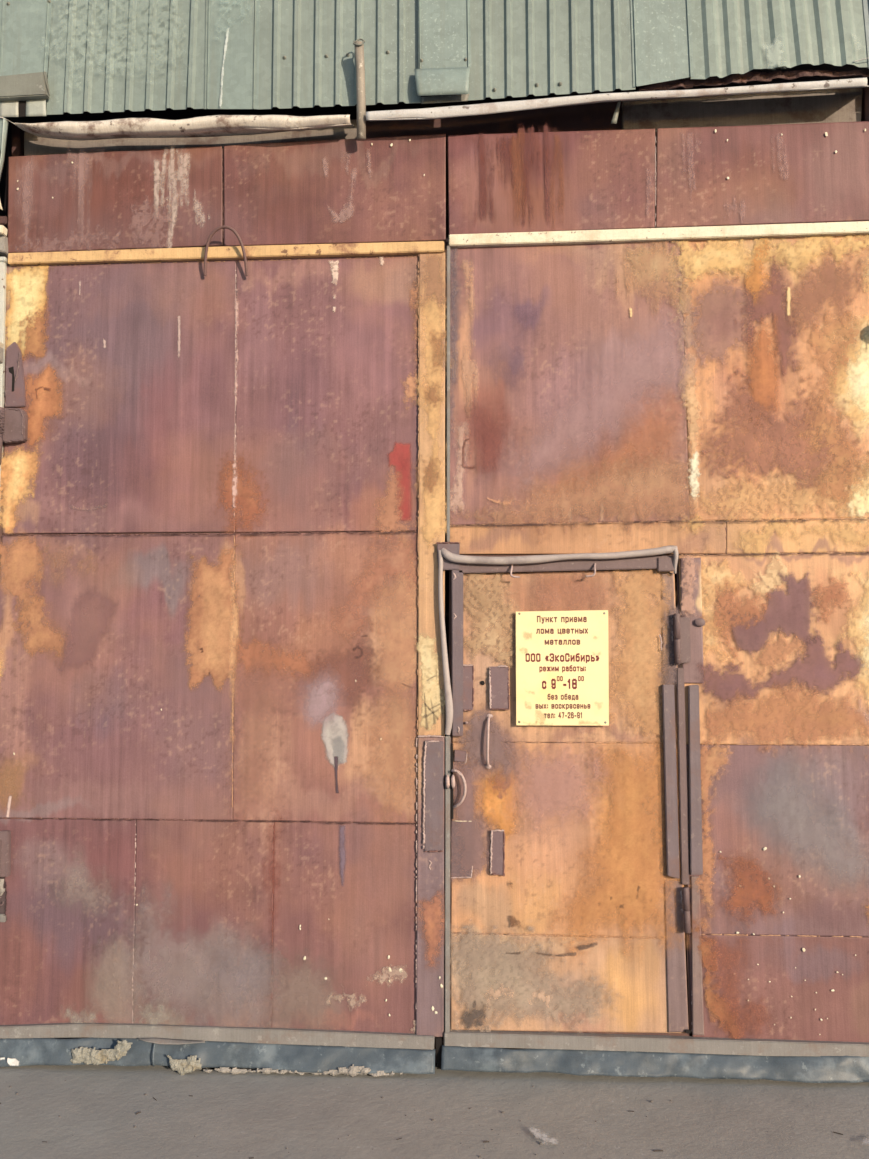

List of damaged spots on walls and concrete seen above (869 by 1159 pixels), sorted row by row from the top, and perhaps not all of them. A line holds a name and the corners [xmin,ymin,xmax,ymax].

rust [479,124,549,222]
rust [693,245,860,375]
rust [20,303,62,446]
rust [404,374,440,403]
rust [424,462,439,492]
rust [0,538,65,656]
rust [185,548,240,689]
rust [699,577,864,702]
rust [475,772,520,835]
rust [569,746,675,943]
rust [697,742,775,1039]